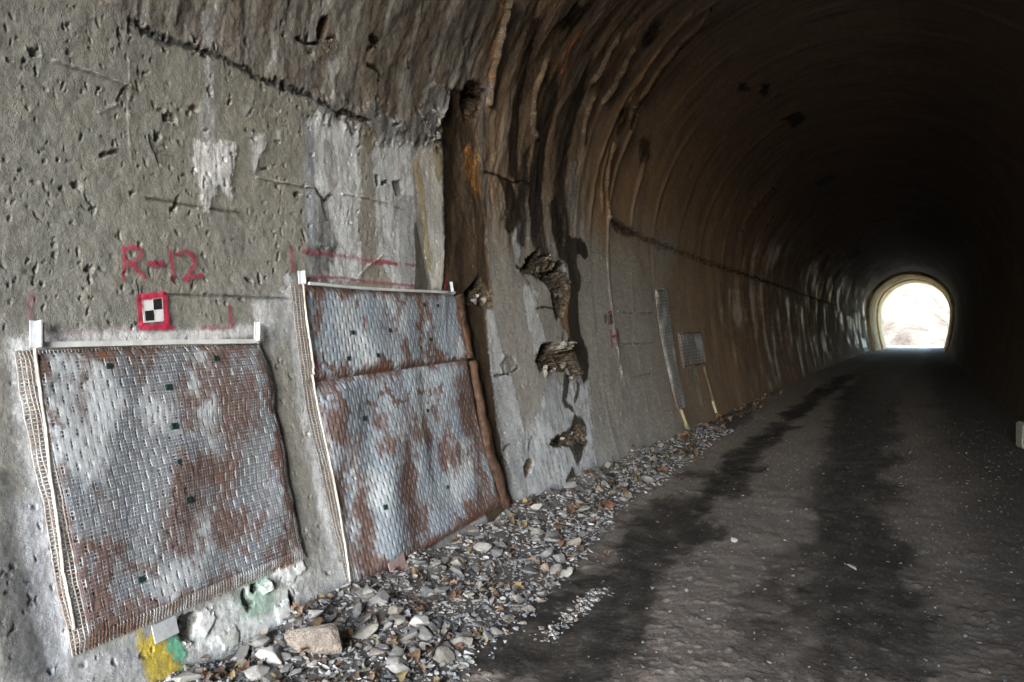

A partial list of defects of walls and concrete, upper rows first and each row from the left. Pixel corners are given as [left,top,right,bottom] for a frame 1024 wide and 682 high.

crack [127,18,353,135]
corrosion [463,135,481,197]
crack [484,171,532,185]